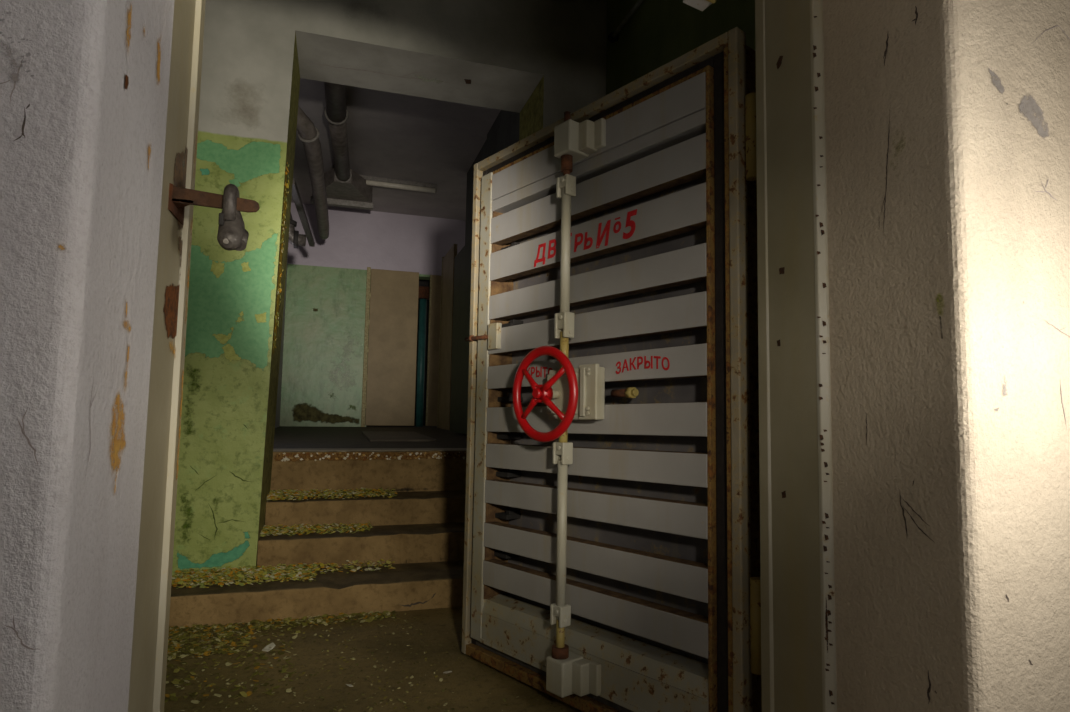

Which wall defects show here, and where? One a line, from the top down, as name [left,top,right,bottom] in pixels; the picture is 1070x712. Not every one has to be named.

crack [0,55,30,141]
rust [174,147,197,188]
peeling [185,140,289,371]
rust [163,276,189,354]